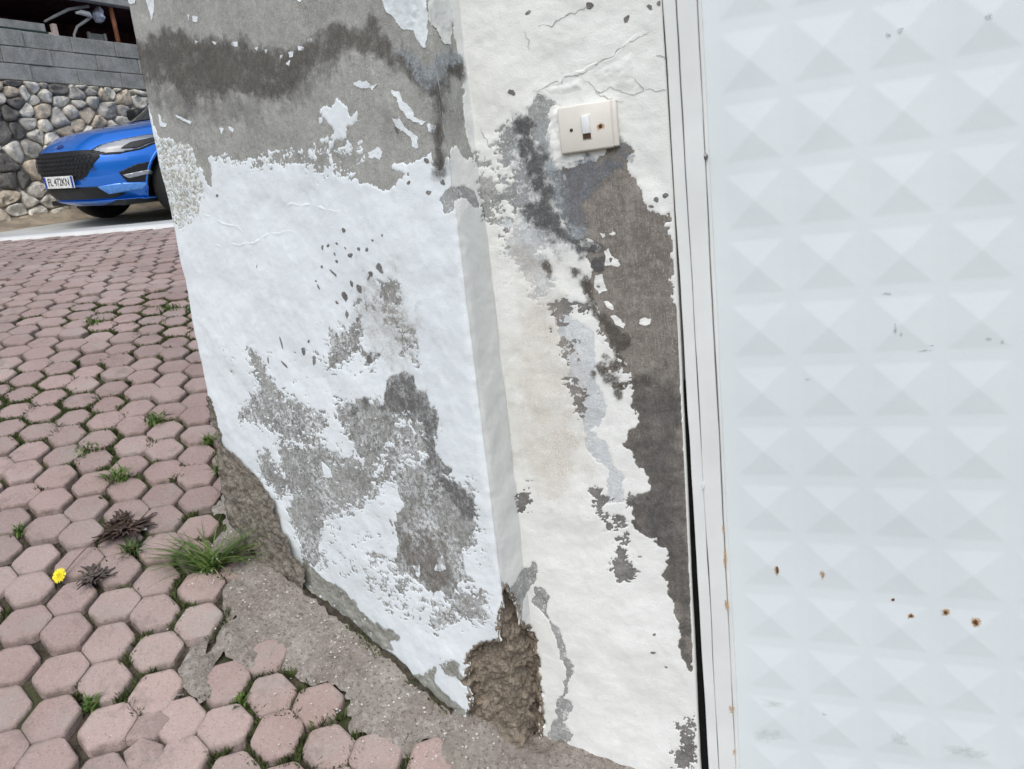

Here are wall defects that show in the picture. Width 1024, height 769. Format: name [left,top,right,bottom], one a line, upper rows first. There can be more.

water stain [136,16,465,177]
peeling [230,263,574,749]
peeling [128,0,693,672]
crack [534,32,667,102]